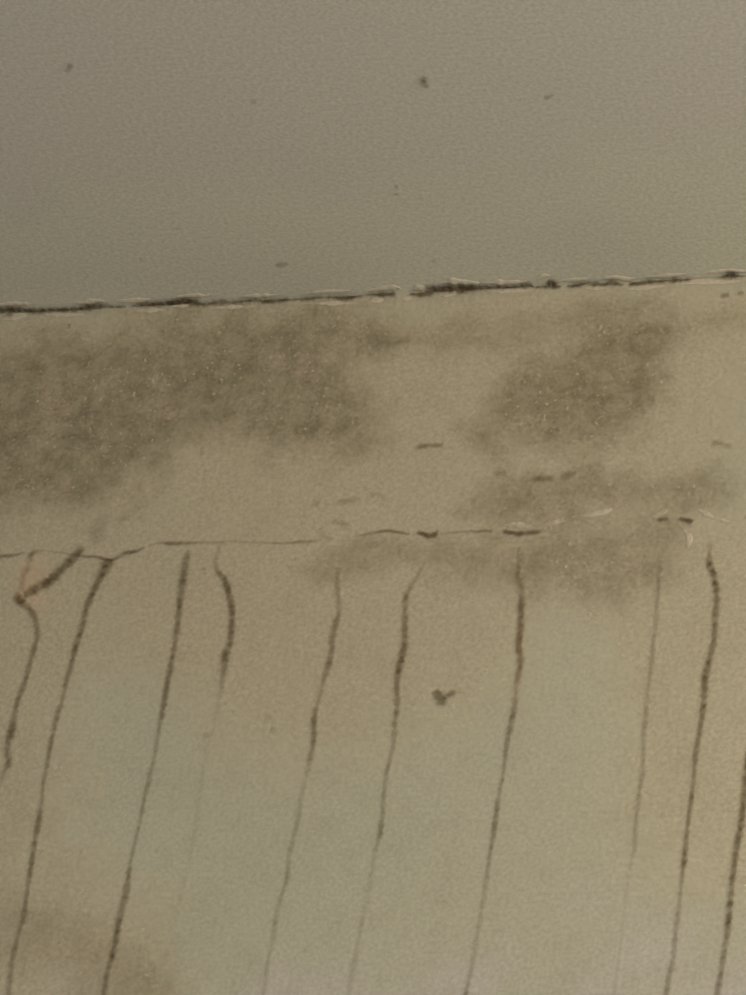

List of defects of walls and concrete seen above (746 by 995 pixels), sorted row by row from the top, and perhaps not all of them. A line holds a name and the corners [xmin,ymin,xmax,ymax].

crack [0,268,746,321]
damp [259,327,466,549]
damp [0,318,287,687]
crack [396,530,437,538]
crack [501,506,613,535]
crack [652,508,731,548]
damp [642,551,746,719]
damp [656,733,735,822]
rust [727,764,746,927]